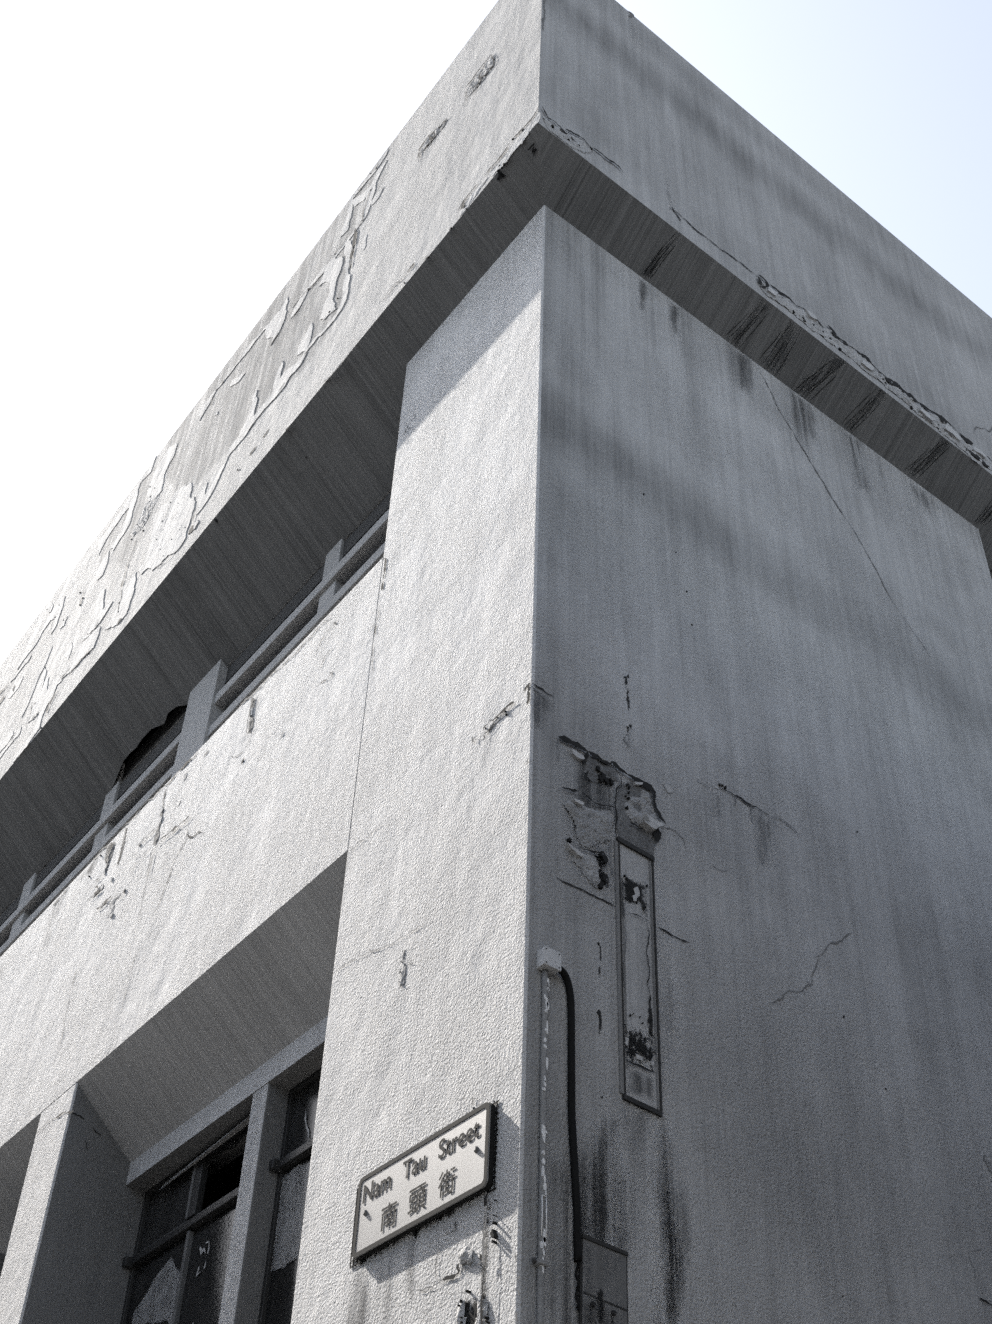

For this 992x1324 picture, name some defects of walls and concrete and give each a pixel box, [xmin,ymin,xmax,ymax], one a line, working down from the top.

crack [380,110,540,302]
spalling [758,275,992,470]
peeling [0,150,388,763]
crack [239,618,337,707]
crack [94,753,200,1004]
flaking render [557,735,666,890]
crack [770,932,852,1003]
flaking render [456,1194,498,1324]
crack [969,1249,992,1305]